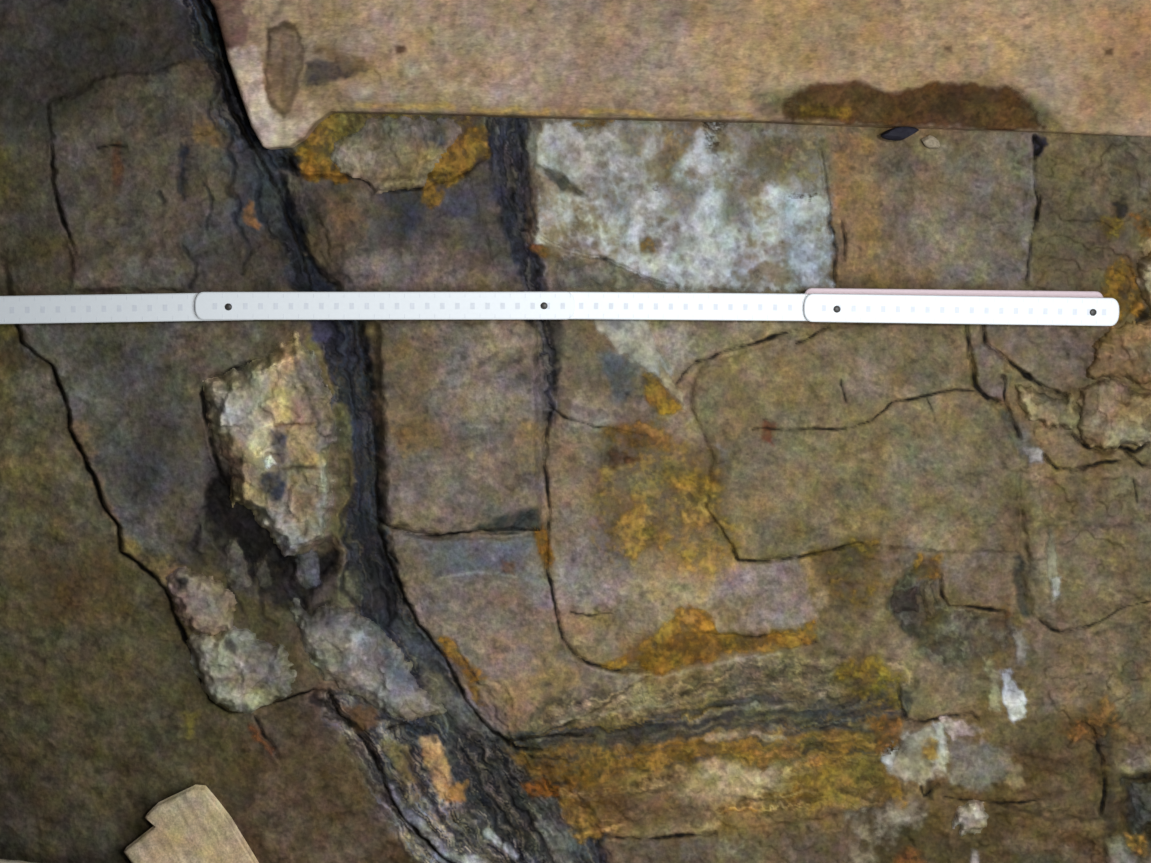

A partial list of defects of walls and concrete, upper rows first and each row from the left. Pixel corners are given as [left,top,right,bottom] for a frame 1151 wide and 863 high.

water stain [534,81,1062,292]
crack [748,332,817,346]
crack [731,545,851,562]